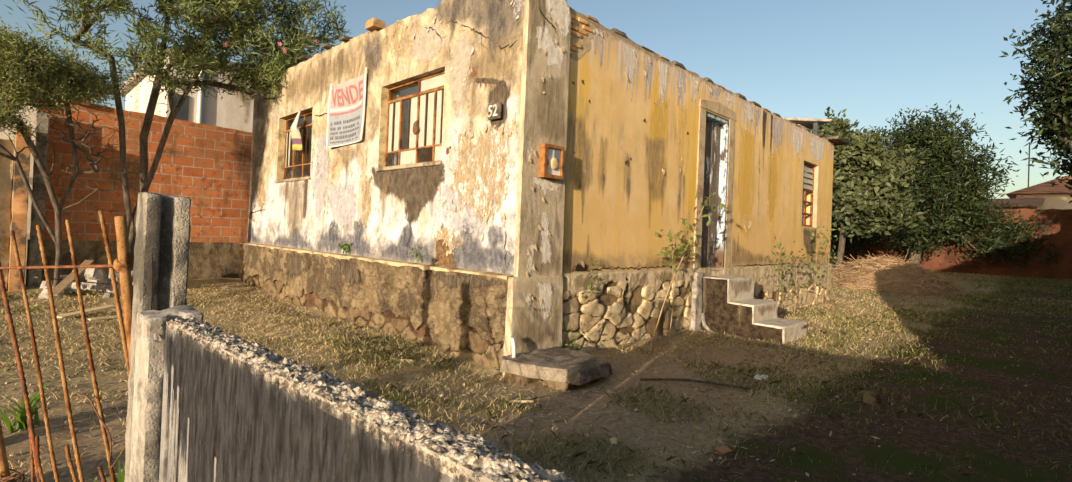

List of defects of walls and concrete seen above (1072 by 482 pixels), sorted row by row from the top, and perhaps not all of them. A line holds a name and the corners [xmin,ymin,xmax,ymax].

damp [372,161,445,261]
peeling [385,17,512,272]
damp [435,221,514,289]
flaking render [535,0,606,109]
spalling [525,177,692,352]
damp [646,140,664,215]
peeling [624,44,825,167]